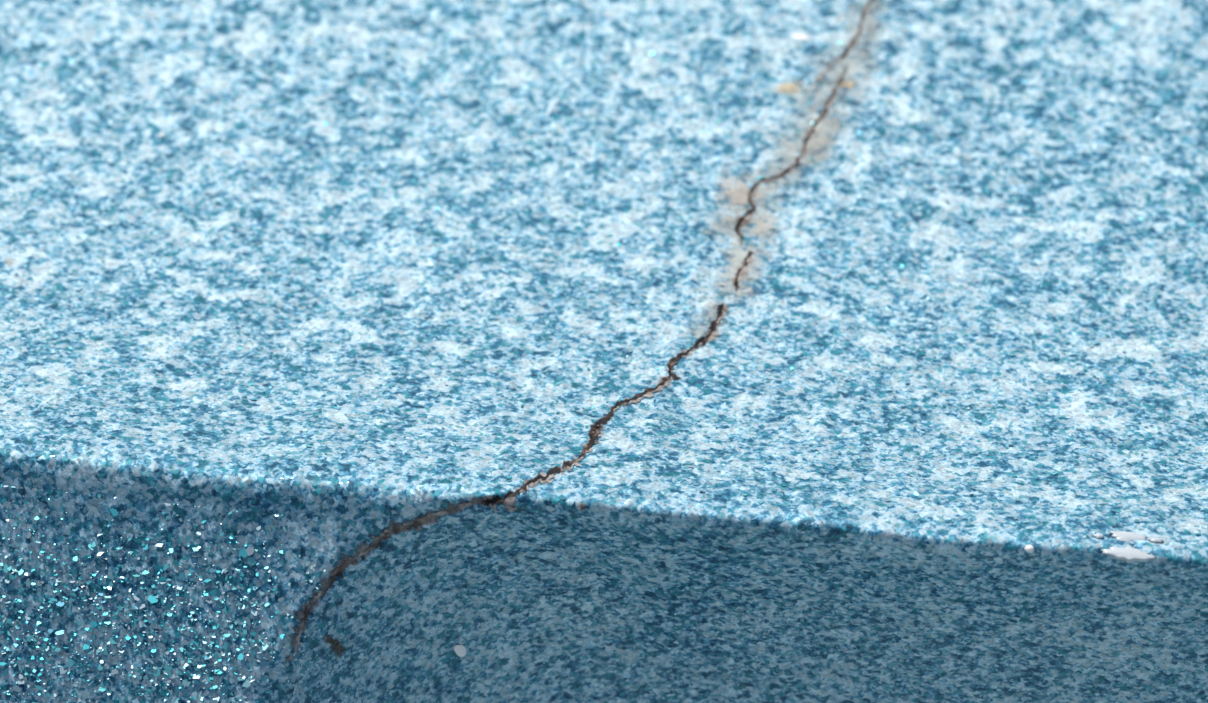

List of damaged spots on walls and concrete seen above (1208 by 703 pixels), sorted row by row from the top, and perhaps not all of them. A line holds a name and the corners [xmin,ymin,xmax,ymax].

crack [287,0,876,661]